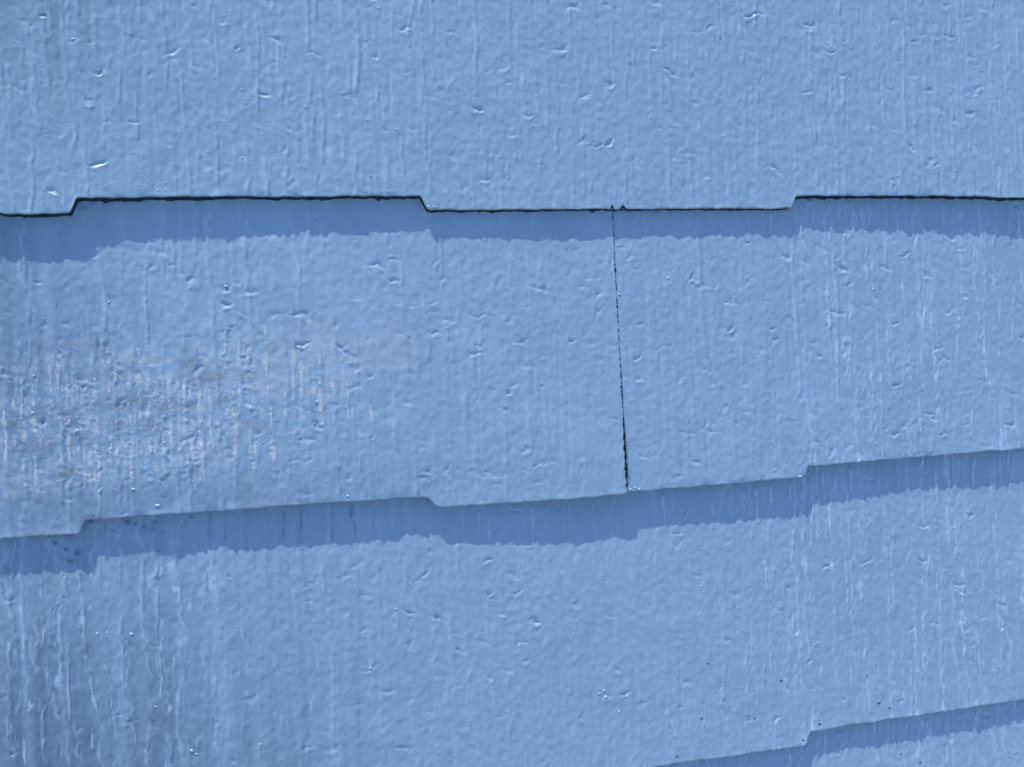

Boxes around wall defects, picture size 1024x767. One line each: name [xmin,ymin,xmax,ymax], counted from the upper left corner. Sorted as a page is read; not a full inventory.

crack [612,210,628,487]